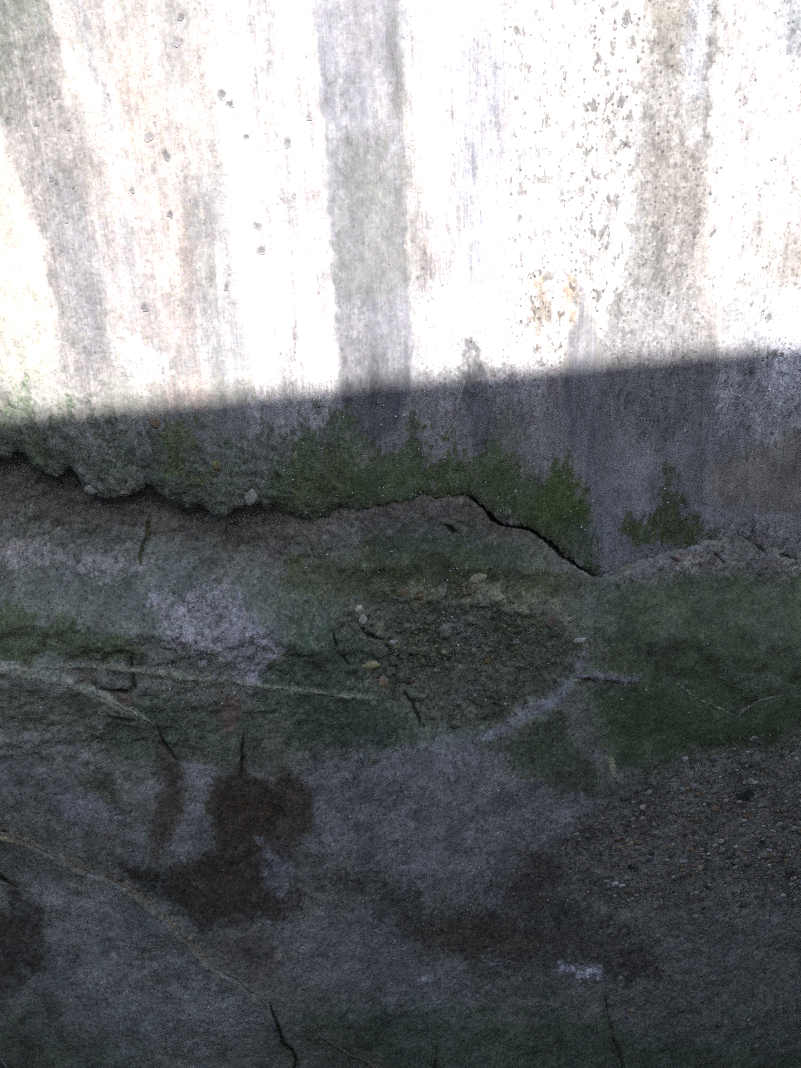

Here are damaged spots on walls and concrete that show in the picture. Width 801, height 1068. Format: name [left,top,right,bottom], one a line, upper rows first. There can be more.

leakage [0,0,184,416]
leakage [138,0,801,566]
crack [138,520,150,564]
crack [468,496,597,577]
leakage [384,573,584,635]
leakage [168,755,220,860]
leakage [251,834,293,904]
crack [270,1005,296,1068]